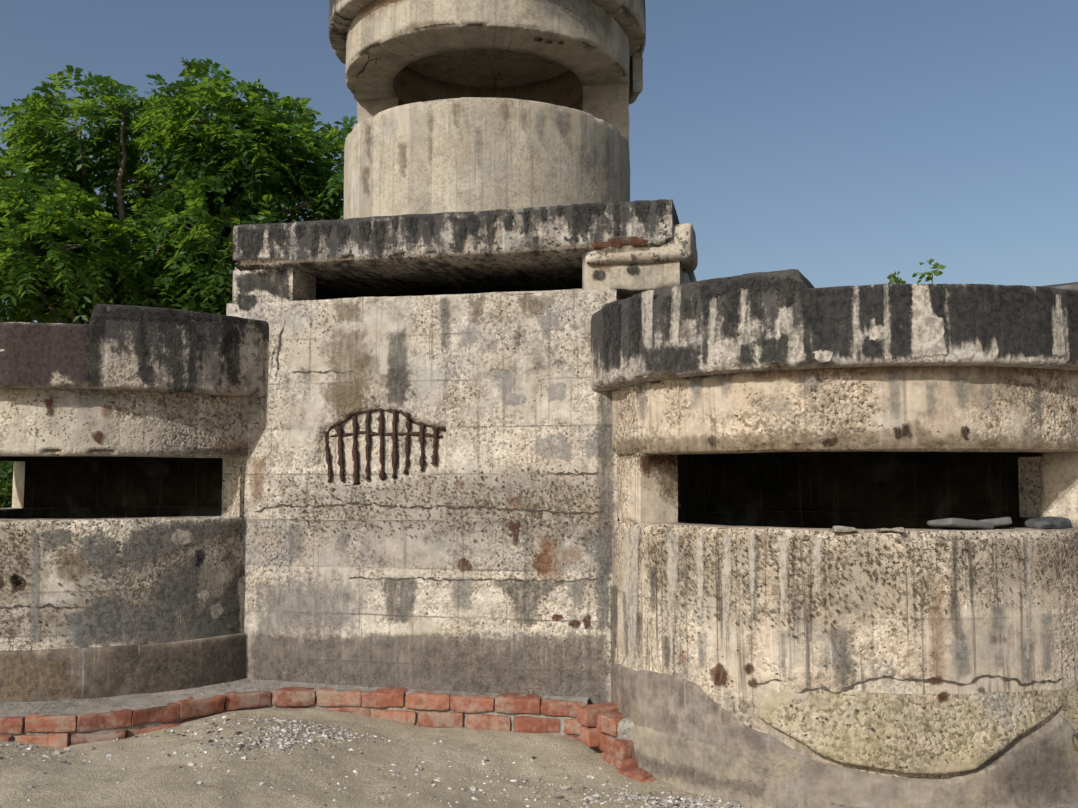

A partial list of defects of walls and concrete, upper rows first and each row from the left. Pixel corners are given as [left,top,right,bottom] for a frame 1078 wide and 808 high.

leakage [450,202,620,252]
leakage [634,199,665,222]
leakage [87,215,434,387]
leakage [440,298,450,346]
leakage [601,275,818,393]
leakage [320,302,408,419]
leakage [103,391,1078,703]
corrosion [710,662,726,686]
corrosion [744,663,757,688]
crack [757,674,1066,699]
peeling [611,663,1078,808]